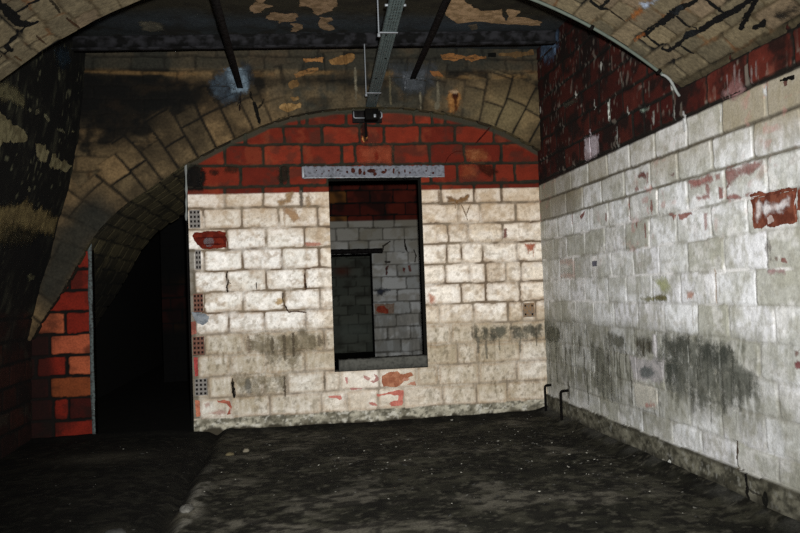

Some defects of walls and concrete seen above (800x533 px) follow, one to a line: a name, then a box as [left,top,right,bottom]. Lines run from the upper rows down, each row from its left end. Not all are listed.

peeling [250,0,338,32]
peeling [445,0,542,30]
crack [585,0,625,22]
crack [643,0,795,54]
corrosion [448,90,461,112]
flaking render [689,162,800,229]
flaking render [192,231,228,250]
damp [248,330,323,363]
damp [472,324,757,414]
peeling [345,371,416,406]